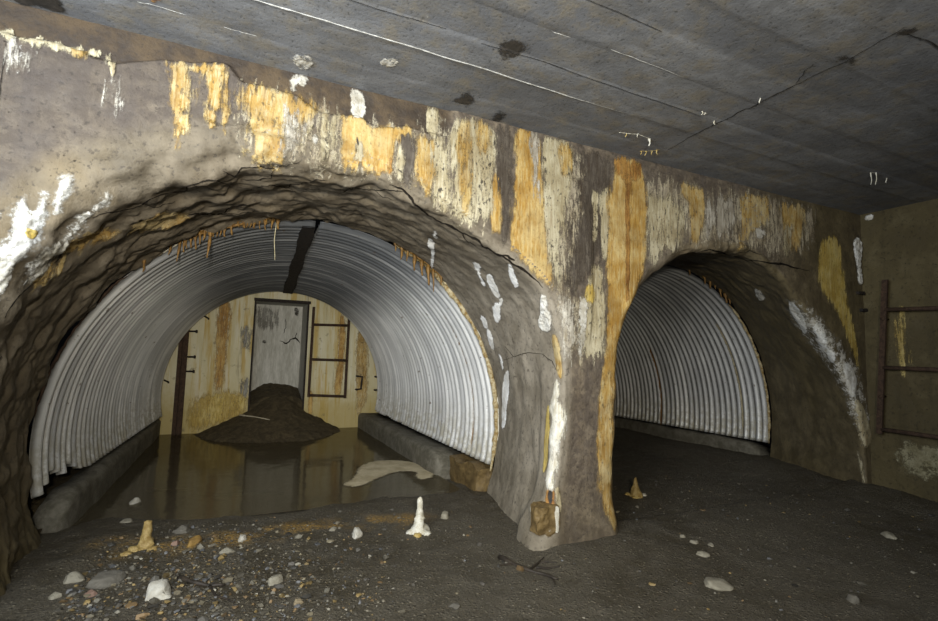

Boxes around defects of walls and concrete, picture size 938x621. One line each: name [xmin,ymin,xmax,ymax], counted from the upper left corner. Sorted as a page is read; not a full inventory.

leakage [0,29,124,111]
crack [481,28,938,150]
leakage [0,175,190,294]
crack [93,162,543,288]
leakage [166,55,871,530]
leakage [895,441,938,481]